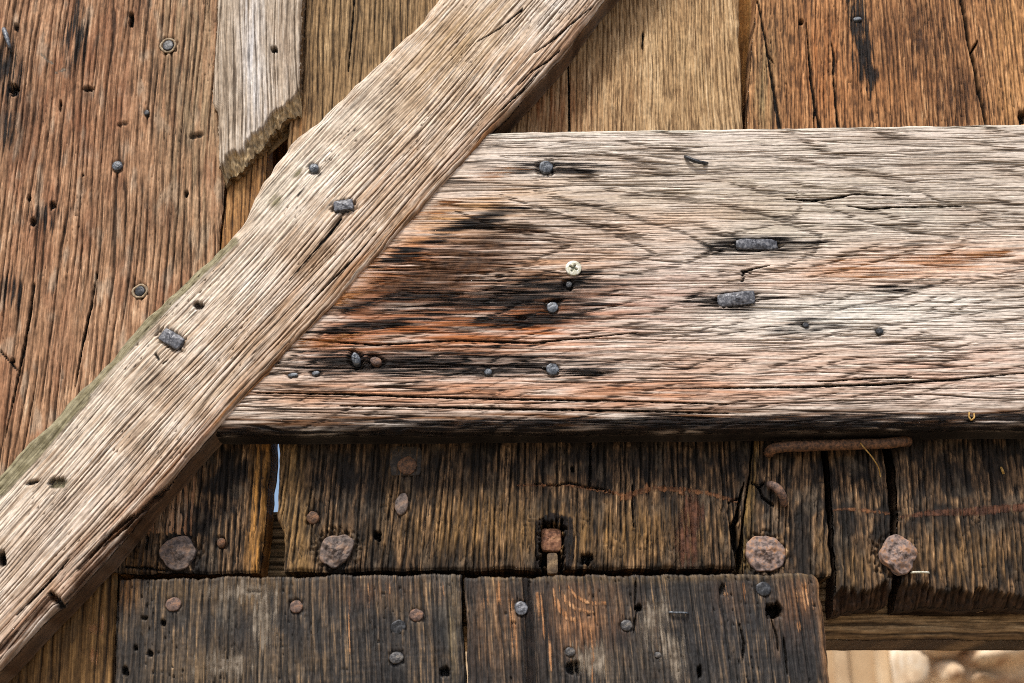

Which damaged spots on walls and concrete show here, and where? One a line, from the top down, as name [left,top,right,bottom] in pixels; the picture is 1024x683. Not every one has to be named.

crack [756,3,781,129]
leakage [846,0,879,100]
crack [959,0,986,125]
crack [786,194,959,210]
leakage [277,201,629,386]
crack [534,443,634,528]
corrosion [517,483,738,569]
crack [727,483,774,557]